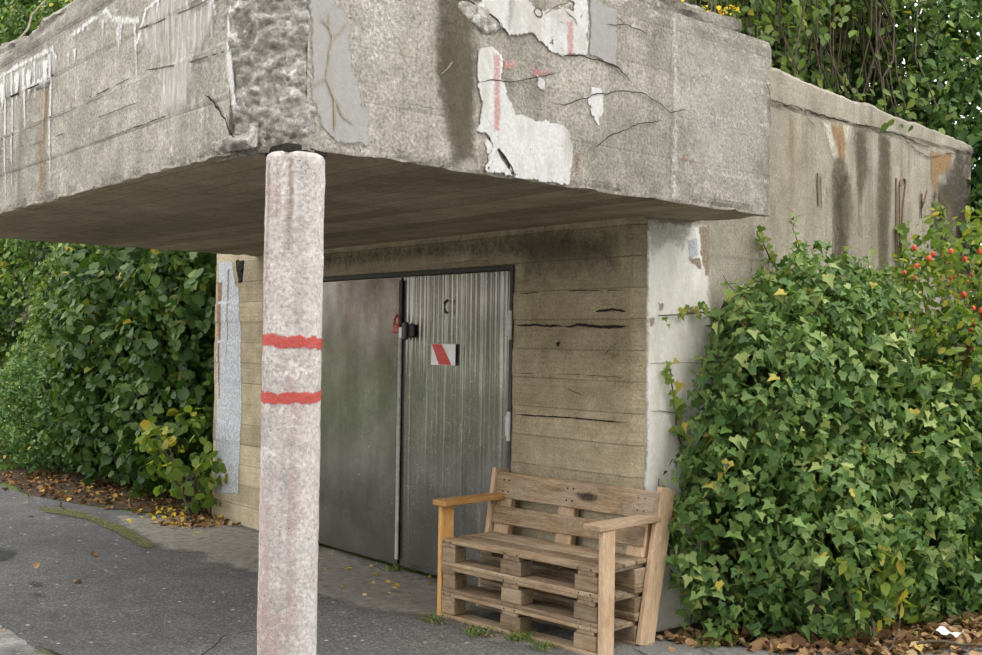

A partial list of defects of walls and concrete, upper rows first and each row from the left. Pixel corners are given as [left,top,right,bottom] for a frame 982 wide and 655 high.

efflorescence [0,47,75,183]
efflorescence [72,0,236,105]
damp [441,0,473,158]
peeling [458,0,589,185]
crack [482,54,694,151]
peeling [588,87,605,128]
corrosion [824,122,849,168]
corrosion [931,152,951,189]